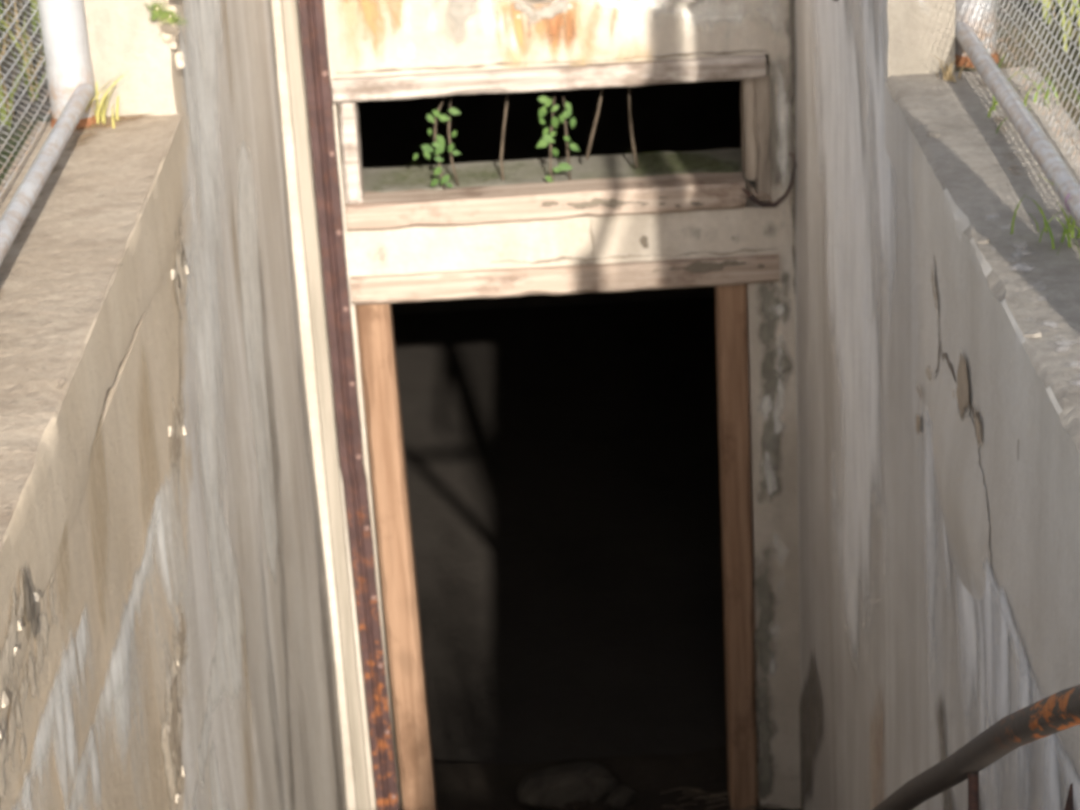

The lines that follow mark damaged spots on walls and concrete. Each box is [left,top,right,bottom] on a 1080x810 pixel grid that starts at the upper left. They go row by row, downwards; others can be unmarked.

rust [361,0,382,49]
rust [499,0,593,65]
damp [759,274,793,497]
crack [933,257,981,424]
spalling [0,569,57,798]
damp [754,549,783,798]